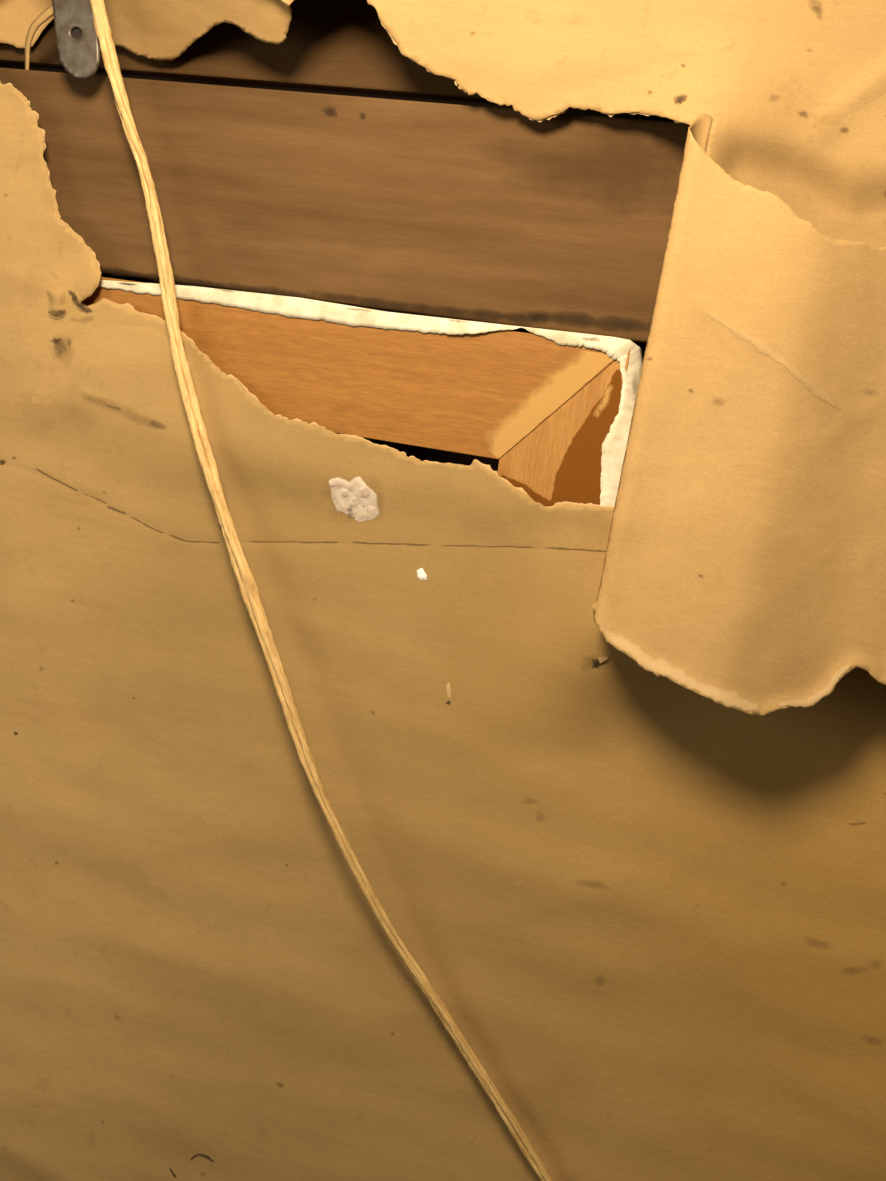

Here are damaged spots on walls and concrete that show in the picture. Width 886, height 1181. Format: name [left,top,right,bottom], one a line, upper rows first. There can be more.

peeling [329,478,376,515]